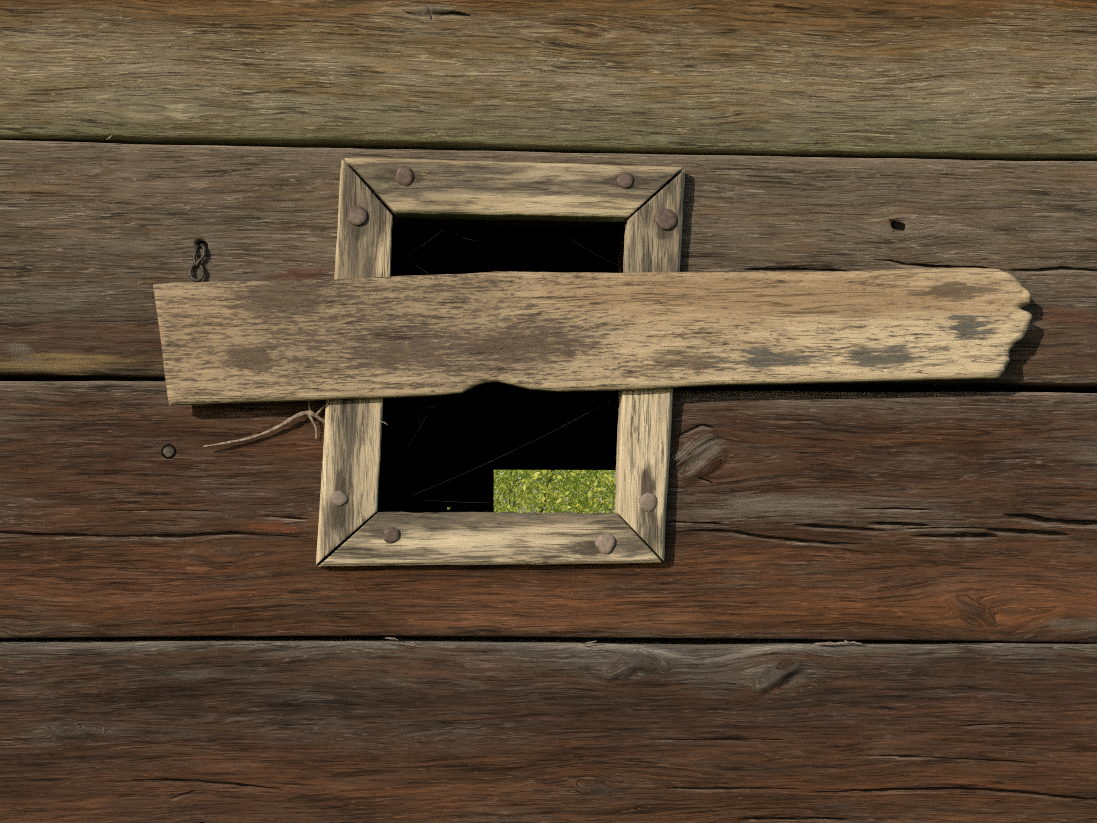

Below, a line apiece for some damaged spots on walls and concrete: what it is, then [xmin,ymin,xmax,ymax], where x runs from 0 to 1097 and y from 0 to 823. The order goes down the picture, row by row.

crack [746,265,848,273]
crack [875,259,1097,271]
crack [669,507,1097,544]
crack [957,720,1027,728]
crack [864,755,1038,763]
crack [667,787,1097,820]